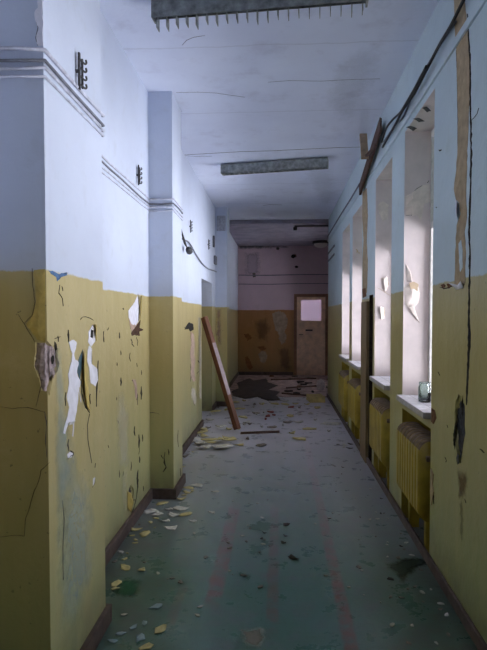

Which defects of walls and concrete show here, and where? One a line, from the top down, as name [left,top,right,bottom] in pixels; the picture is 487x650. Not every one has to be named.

peeling [440,0,469,290]
crack [466,14,479,405]
crack [18,269,45,343]
peeling [34,316,109,460]
peeling [123,296,143,346]
peeling [184,317,201,405]
flaking render [447,398,465,465]